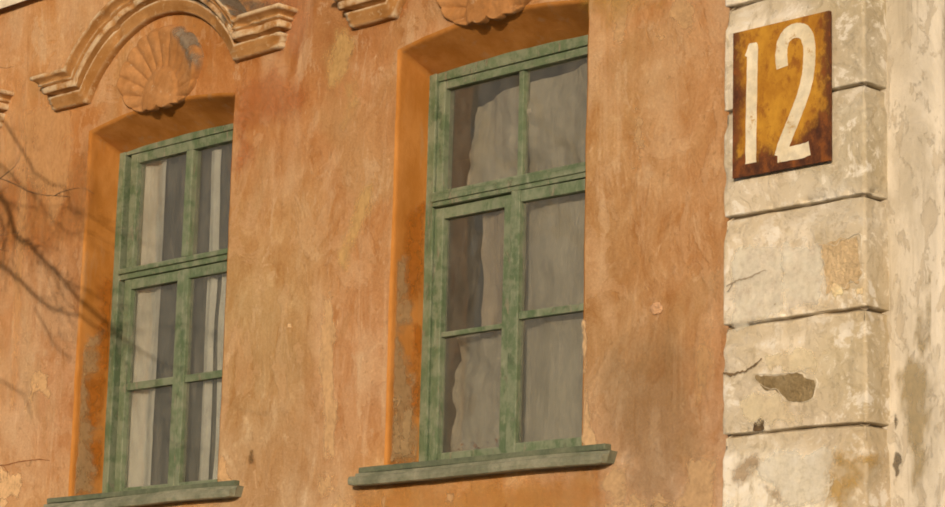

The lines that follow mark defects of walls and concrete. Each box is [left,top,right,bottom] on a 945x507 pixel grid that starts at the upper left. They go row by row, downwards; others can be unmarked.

crack [726,270,766,292]
peeling [732,233,864,330]
spalling [754,370,818,403]
peeling [0,467,22,507]
peeling [602,460,716,507]
peeling [757,447,834,506]